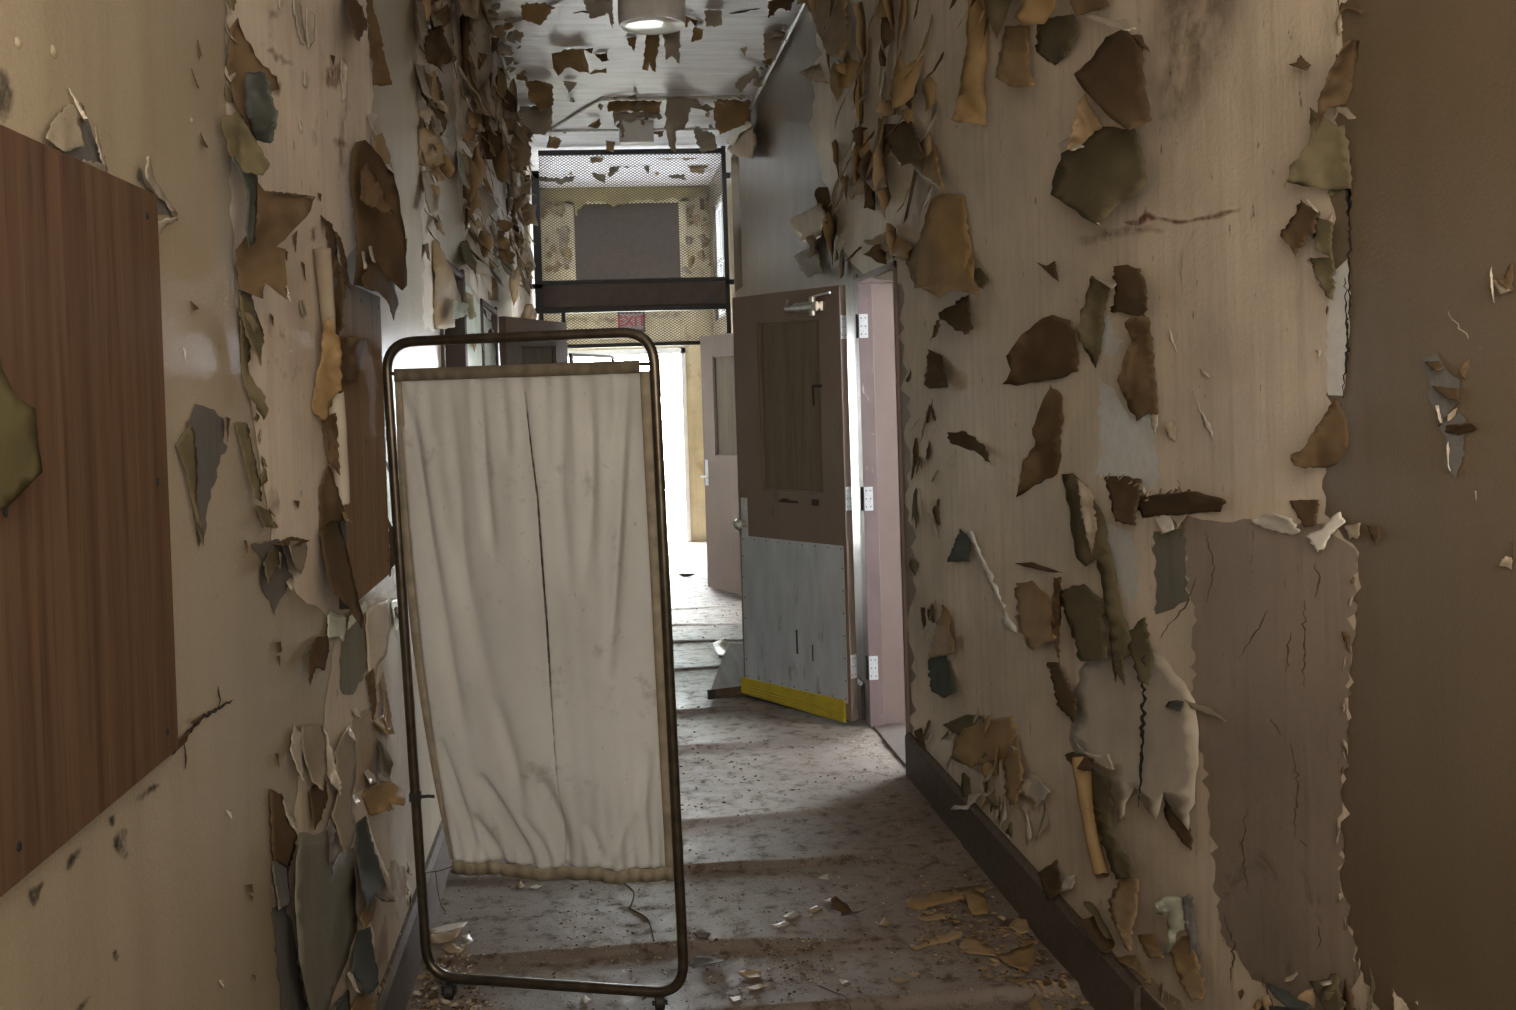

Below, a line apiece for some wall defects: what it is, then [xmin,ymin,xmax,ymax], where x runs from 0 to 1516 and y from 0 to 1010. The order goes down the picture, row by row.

peeling [1421,353,1480,479]
peeling [175,0,412,1010]
peeling [414,0,1418,1010]
peeling [1497,541,1513,570]
crack [172,687,233,770]